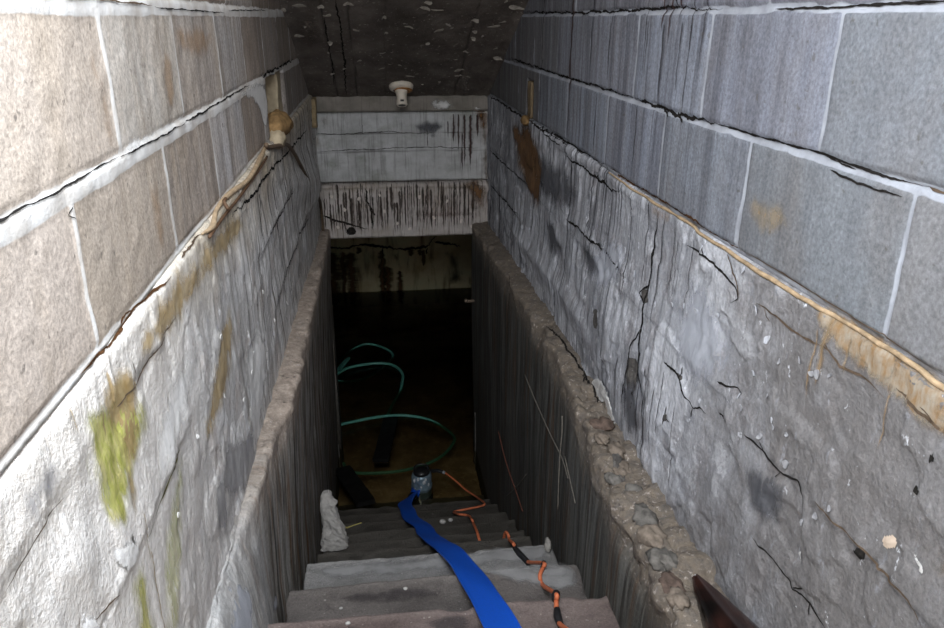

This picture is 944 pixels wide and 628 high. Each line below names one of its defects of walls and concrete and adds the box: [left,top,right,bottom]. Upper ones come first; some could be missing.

crack [324,2,347,94]
crack [0,59,293,222]
corrosion [513,126,541,204]
crack [512,59,944,197]
crack [491,98,944,433]
water stain [101,372,138,459]
water stain [217,251,286,528]
crack [6,498,64,591]
crack [79,595,120,627]
water stain [113,515,165,627]
crack [148,451,179,538]
crack [745,436,922,628]